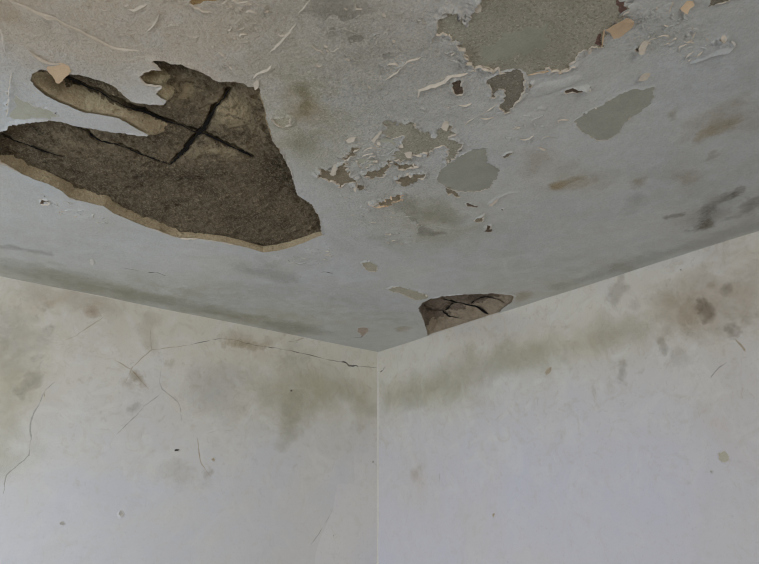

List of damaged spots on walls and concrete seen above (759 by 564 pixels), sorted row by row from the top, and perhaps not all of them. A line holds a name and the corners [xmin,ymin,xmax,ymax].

spalling [0,55,325,252]
peeling [311,117,500,232]
peeling [426,0,644,117]
peeling [573,73,657,141]
spalling [385,286,517,335]
crack [3,382,55,494]
crack [117,330,386,434]